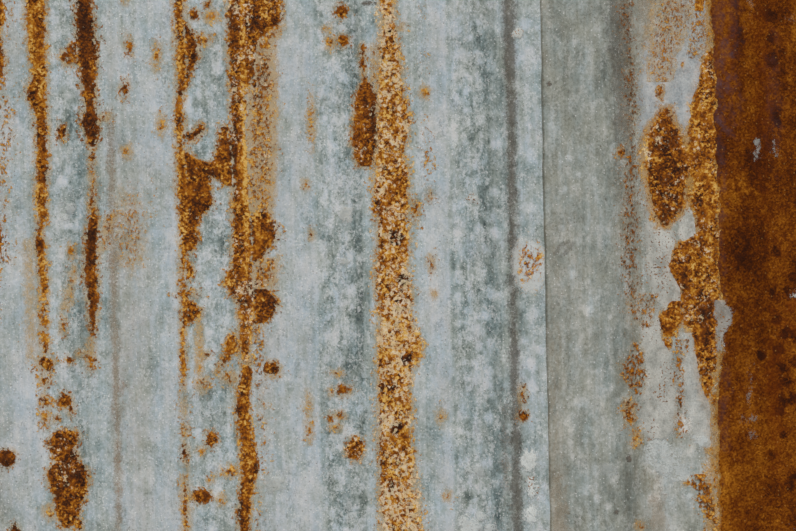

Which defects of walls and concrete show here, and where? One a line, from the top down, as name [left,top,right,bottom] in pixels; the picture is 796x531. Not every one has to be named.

rust [0,0,165,531]
rust [148,0,291,531]
rust [298,0,441,531]
rust [510,231,545,293]
rust [612,0,796,531]